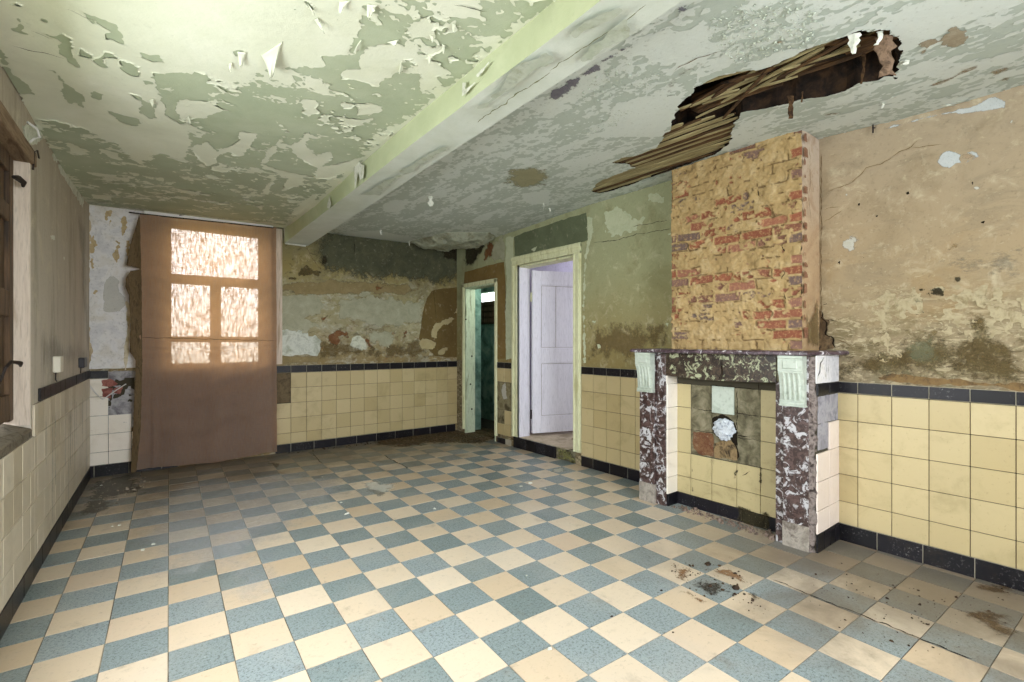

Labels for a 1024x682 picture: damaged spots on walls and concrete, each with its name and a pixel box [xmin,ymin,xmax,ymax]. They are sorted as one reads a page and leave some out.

peeling [0,50,35,99]
crack [478,6,644,122]
peeling [695,2,1024,162]
peeling [22,0,553,294]
water stain [505,168,547,187]
peeling [330,0,926,363]
crack [809,141,939,376]
peeling [100,301,135,434]
peeling [277,279,424,403]
peeling [691,385,761,467]
water stain [839,317,1020,383]